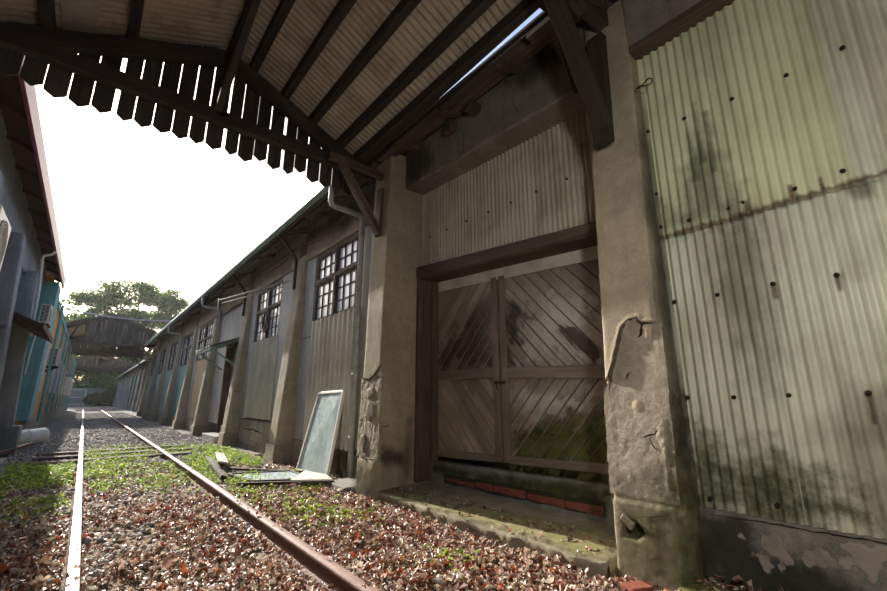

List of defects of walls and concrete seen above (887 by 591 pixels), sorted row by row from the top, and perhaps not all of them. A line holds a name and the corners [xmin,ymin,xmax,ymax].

corrosion [662,183,829,238]
leakage [438,288,604,371]
flaking render [604,318,680,505]
peeling [752,532,887,584]